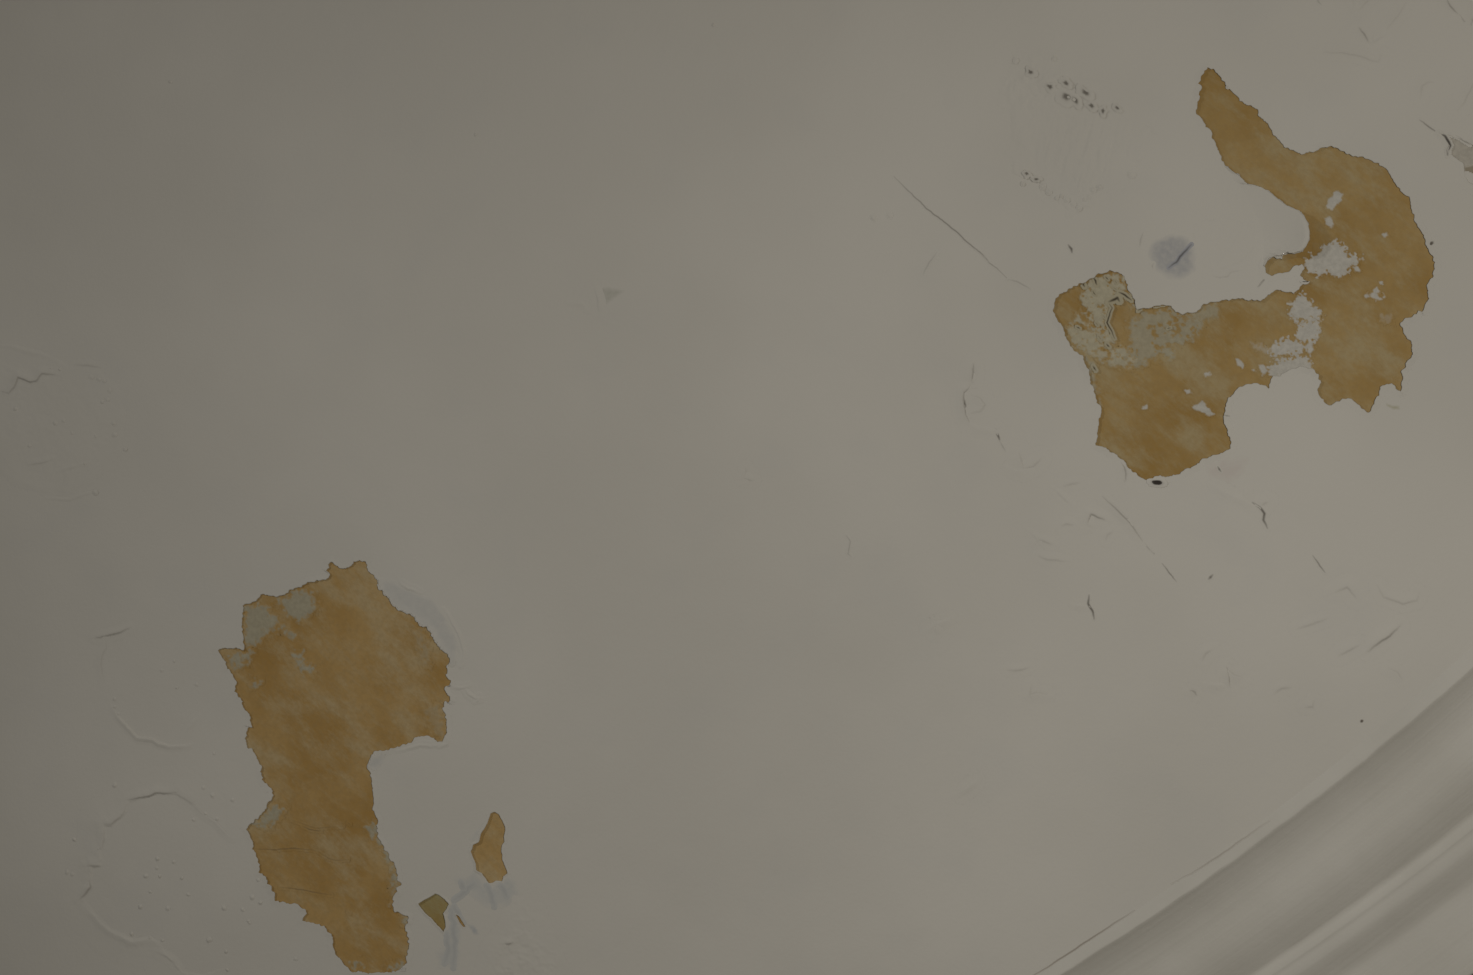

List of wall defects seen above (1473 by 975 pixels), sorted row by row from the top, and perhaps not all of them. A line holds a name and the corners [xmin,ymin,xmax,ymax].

spalling [1025,66,1123,118]
peeling [1047,61,1441,487]
peeling [213,555,485,975]
peeling [468,809,510,886]